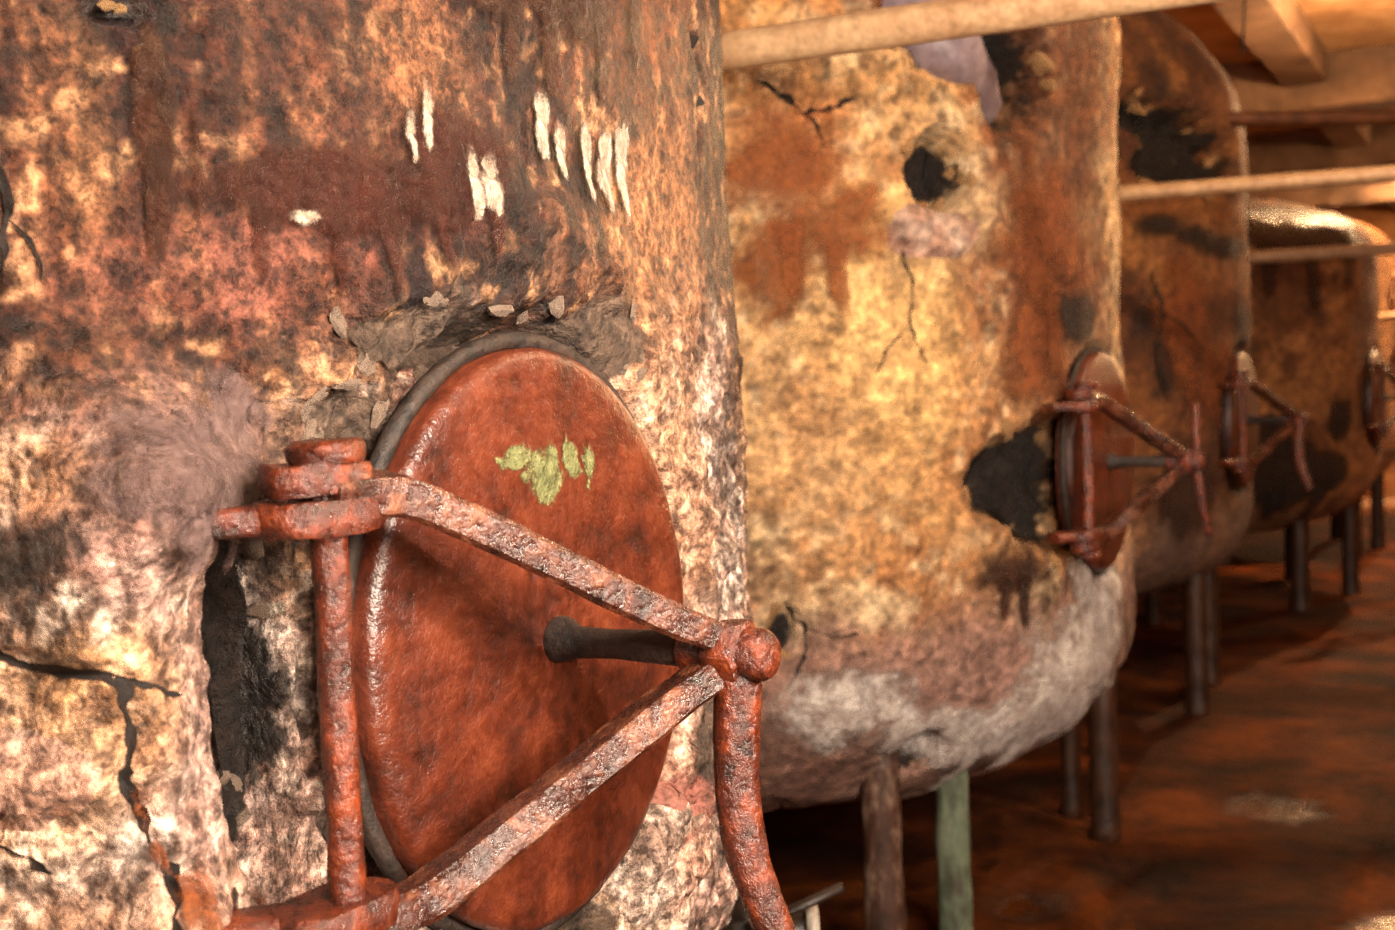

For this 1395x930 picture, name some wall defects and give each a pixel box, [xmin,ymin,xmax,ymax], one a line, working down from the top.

spalling [901,140,978,212]
spalling [962,417,1061,569]
spalling [201,538,293,848]
crack [0,649,184,930]
crack [233,887,241,909]